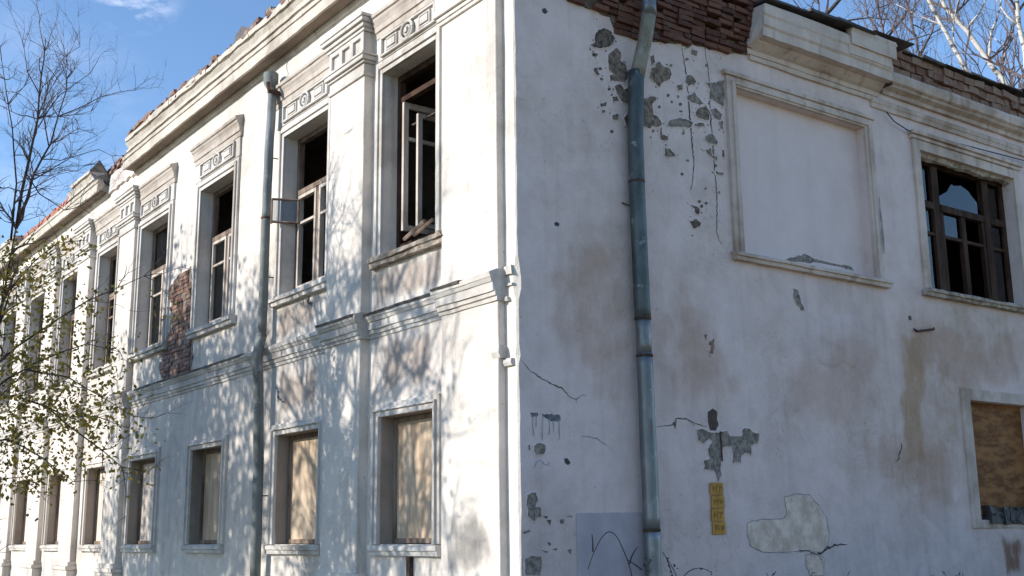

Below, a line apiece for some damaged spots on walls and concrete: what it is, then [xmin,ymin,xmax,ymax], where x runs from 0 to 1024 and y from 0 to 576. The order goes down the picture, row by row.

flaking render [566,0,641,133]
flaking render [644,0,759,177]
crack [682,50,720,241]
flaking render [687,187,720,236]
flaking render [786,254,854,271]
flaking render [159,266,193,380]
crack [520,359,586,402]
flaking render [695,408,760,483]
flaking render [523,491,572,534]
flaking render [523,542,572,576]
peeling [746,493,829,576]
crack [747,493,847,576]